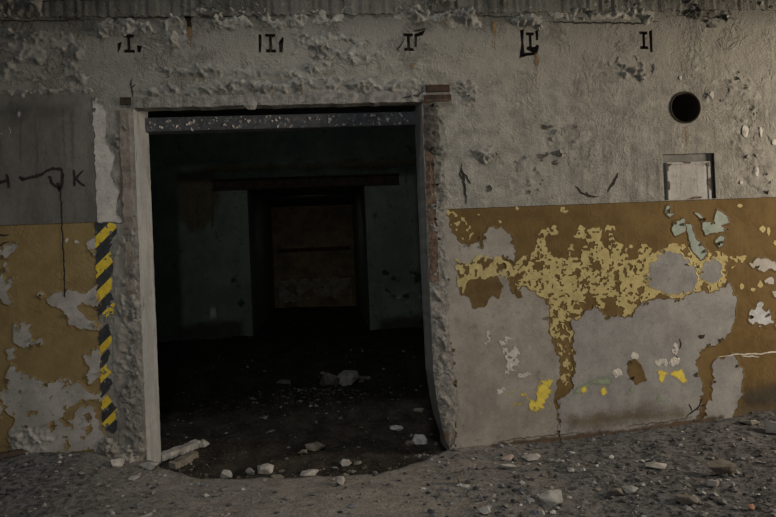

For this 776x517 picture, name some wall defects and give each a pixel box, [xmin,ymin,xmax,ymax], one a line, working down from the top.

peeling [0,95,147,463]
crack [459,164,471,204]
crack [576,173,618,198]
peeling [425,103,776,448]